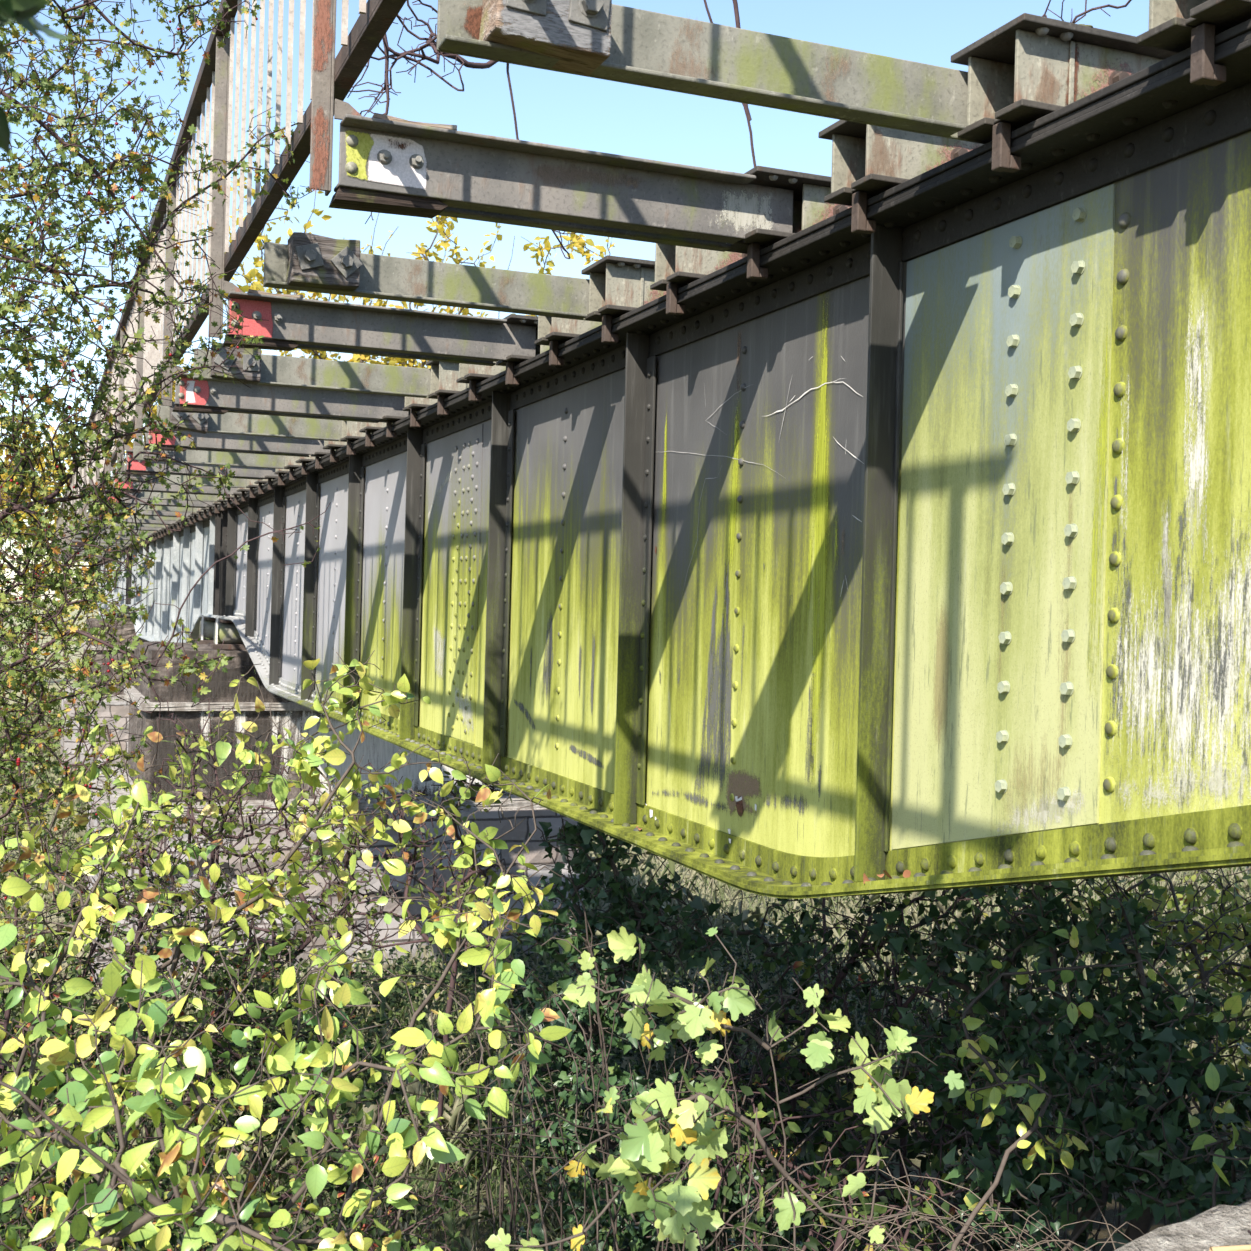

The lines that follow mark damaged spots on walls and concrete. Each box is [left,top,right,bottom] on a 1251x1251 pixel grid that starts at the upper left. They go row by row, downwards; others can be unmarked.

damp [1175,496,1188,600]
damp [1107,533,1131,726]
damp [1210,575,1249,717]